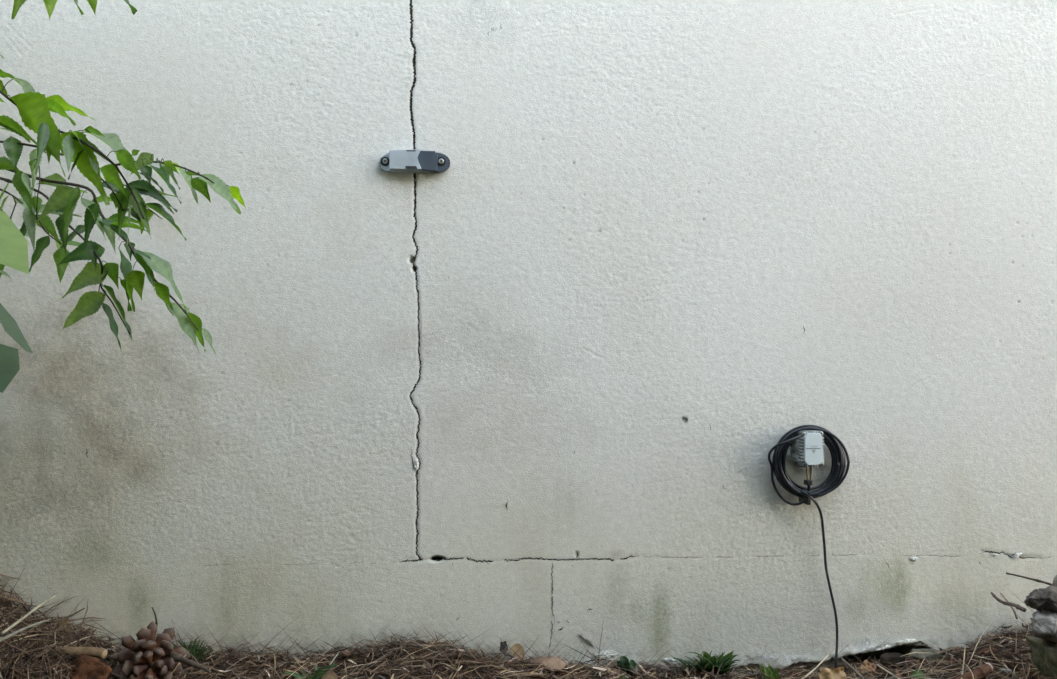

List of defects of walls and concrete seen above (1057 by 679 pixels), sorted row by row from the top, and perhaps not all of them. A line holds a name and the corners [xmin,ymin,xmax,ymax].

crack [282,0,784,654]